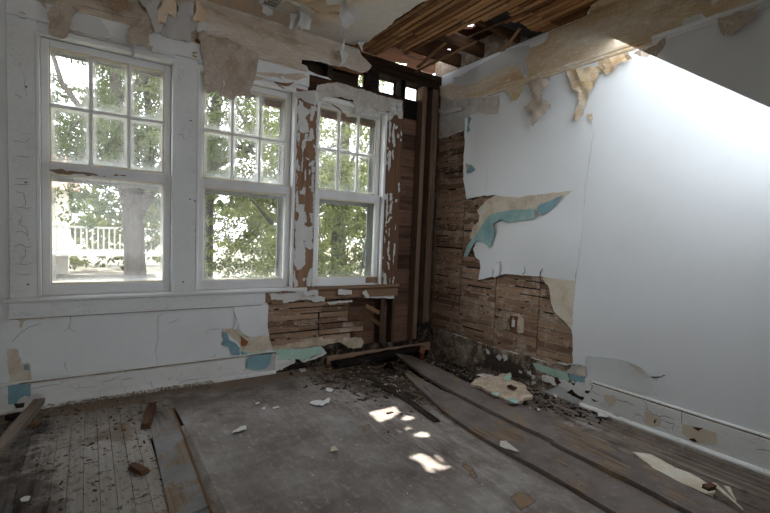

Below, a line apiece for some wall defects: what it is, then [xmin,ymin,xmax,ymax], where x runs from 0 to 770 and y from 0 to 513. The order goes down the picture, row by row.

peeling [430,0,758,101]
peeling [36,0,454,370]
spalling [427,191,616,417]
peeling [7,349,31,404]
peeling [682,424,717,444]